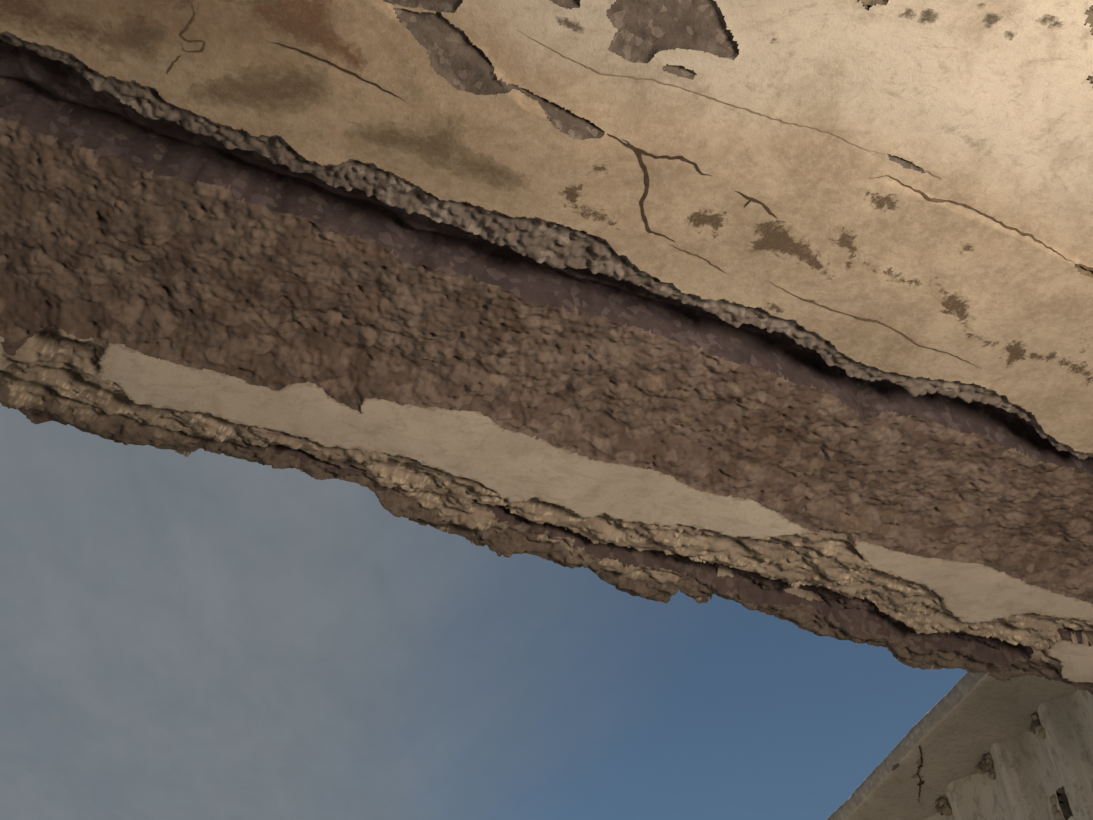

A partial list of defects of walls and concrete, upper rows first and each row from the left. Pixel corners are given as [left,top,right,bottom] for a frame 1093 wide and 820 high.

peeling [606,0,739,63]
peeling [856,0,889,11]
peeling [901,10,936,23]
peeling [1084,5,1093,35]
crack [266,40,406,102]
spalling [383,0,605,140]
crack [517,30,1093,275]
spalling [0,31,1093,604]
crack [767,281,982,369]
spalling [0,327,1093,695]
crack [911,746,925,806]
spalling [1050,786,1073,820]